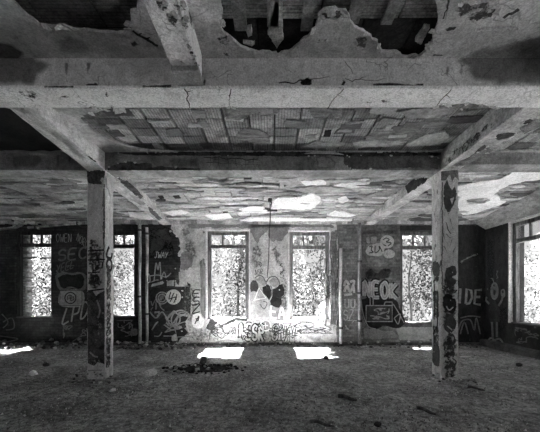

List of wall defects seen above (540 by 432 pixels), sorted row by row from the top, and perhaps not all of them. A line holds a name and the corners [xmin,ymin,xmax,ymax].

flaking render [15,0,137,35]
peeling [156,0,195,29]
flaking render [218,0,438,58]
crack [328,62,382,108]
damp [462,58,540,82]
flaking render [0,100,540,239]